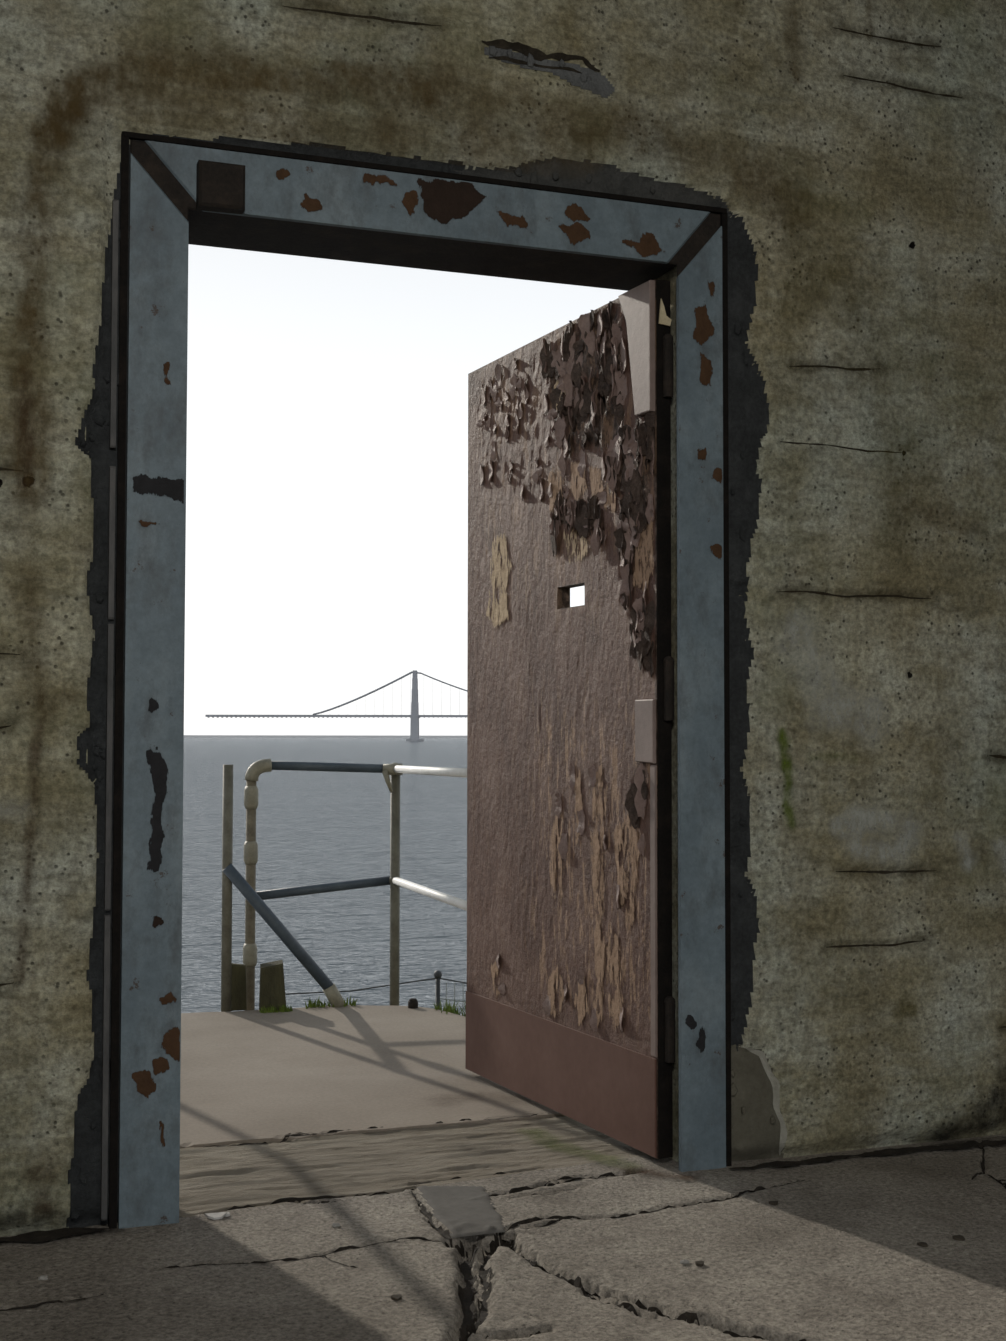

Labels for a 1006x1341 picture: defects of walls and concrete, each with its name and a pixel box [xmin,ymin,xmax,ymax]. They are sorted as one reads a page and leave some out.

corrosion [276,168,290,180]
corrosion [300,193,322,212]
corrosion [362,173,486,224]
corrosion [498,211,528,229]
corrosion [559,203,591,245]
corrosion [622,232,662,257]
corrosion [693,282,715,386]
corrosion [697,447,722,483]
spalling [66,133,787,1228]
corrosion [159,992,177,1005]
corrosion [132,1026,180,1099]
crack [159,1140,1006,1341]